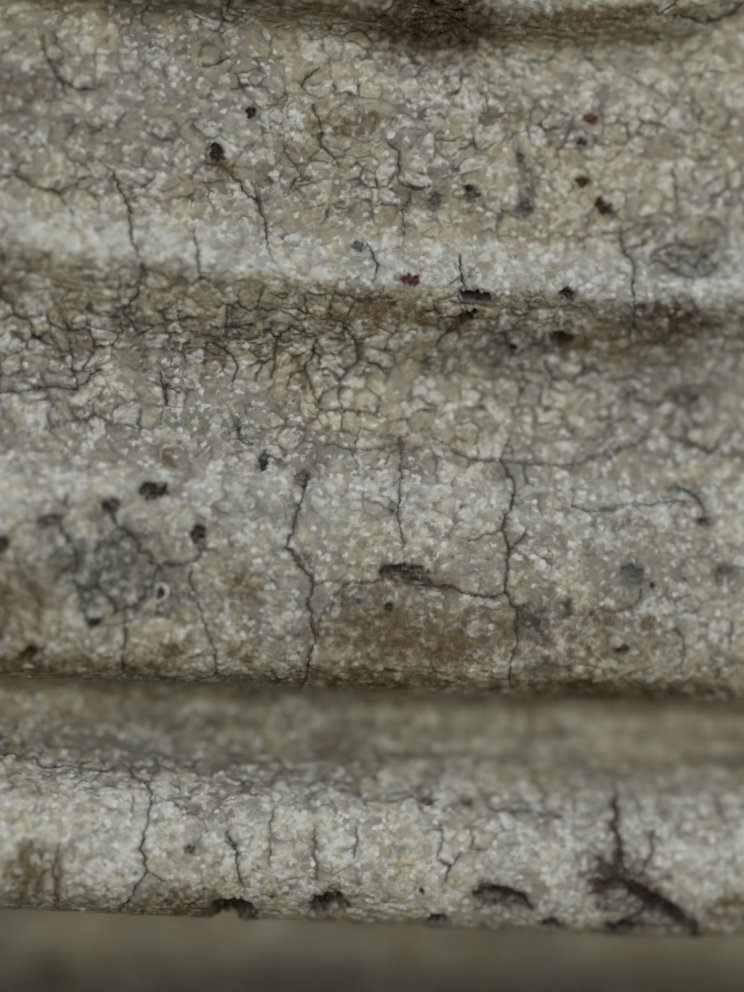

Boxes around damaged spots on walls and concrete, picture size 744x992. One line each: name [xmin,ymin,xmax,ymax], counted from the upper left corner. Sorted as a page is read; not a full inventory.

rust [373,0,494,62]
crack [0,296,102,394]
crack [98,160,153,336]
crack [224,169,276,264]
crack [210,304,319,403]
crack [450,255,470,285]
crack [562,222,666,348]
crack [332,438,404,549]
crack [16,495,218,676]
crack [285,482,382,685]
crack [431,435,648,681]
crack [0,752,202,909]